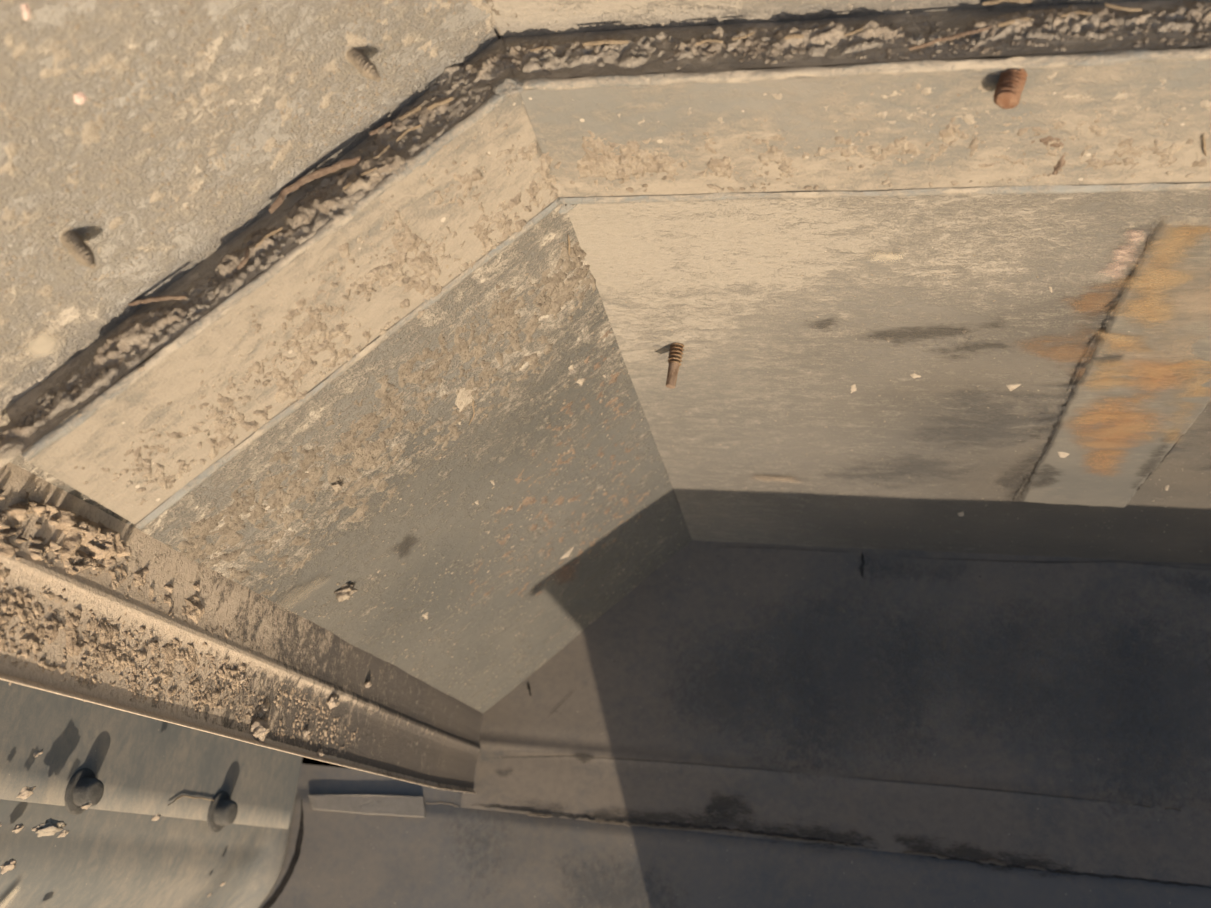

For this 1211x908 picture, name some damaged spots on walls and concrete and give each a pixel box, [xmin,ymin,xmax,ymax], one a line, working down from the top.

crack [1012,232,1152,502]
rust [1125,230,1191,321]